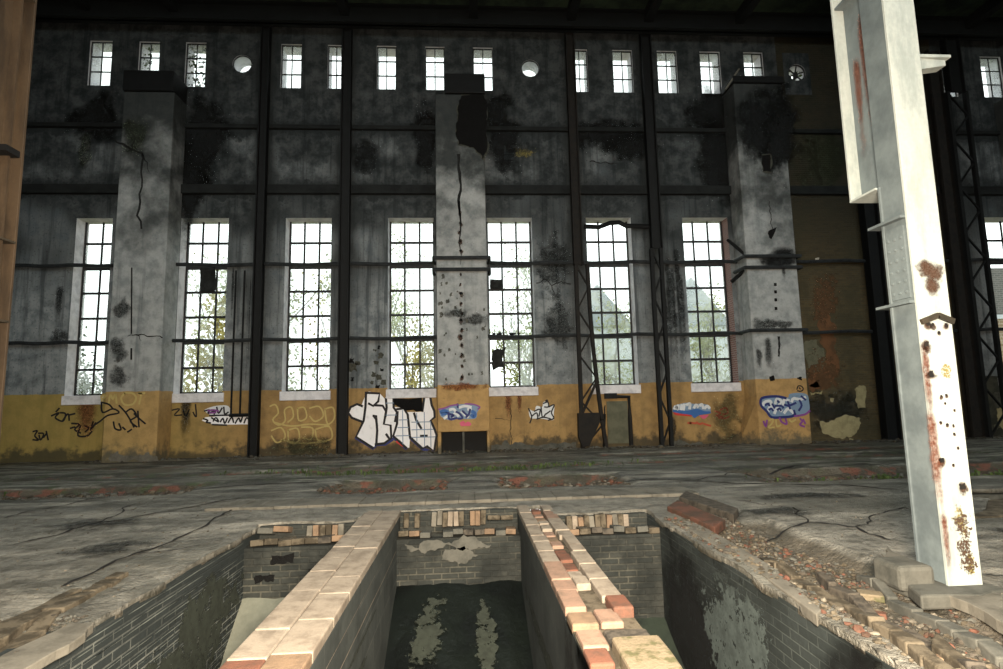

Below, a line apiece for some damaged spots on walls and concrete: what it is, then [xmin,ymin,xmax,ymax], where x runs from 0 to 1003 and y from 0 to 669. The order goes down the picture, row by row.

spalling [455,94,490,161]
crack [455,154,463,265]
rust [919,260,943,293]
flaking render [797,292,840,402]
rust [921,322,956,412]
peeling [817,385,867,440]
rust [928,416,959,482]
crack [5,482,311,586]
crack [668,465,904,543]
rust [942,504,978,575]